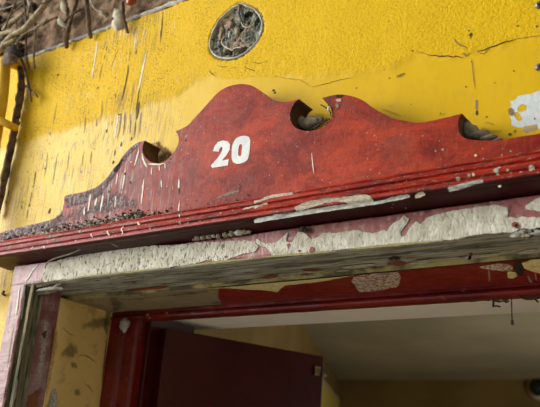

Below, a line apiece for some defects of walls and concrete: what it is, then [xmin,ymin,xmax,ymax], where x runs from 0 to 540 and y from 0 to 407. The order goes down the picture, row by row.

flaking render [209,3,265,61]
crack [420,35,540,58]
peeling [508,90,540,132]
peeling [448,173,483,192]
peeling [254,192,425,223]
peeling [40,197,540,282]
peeling [211,272,401,293]